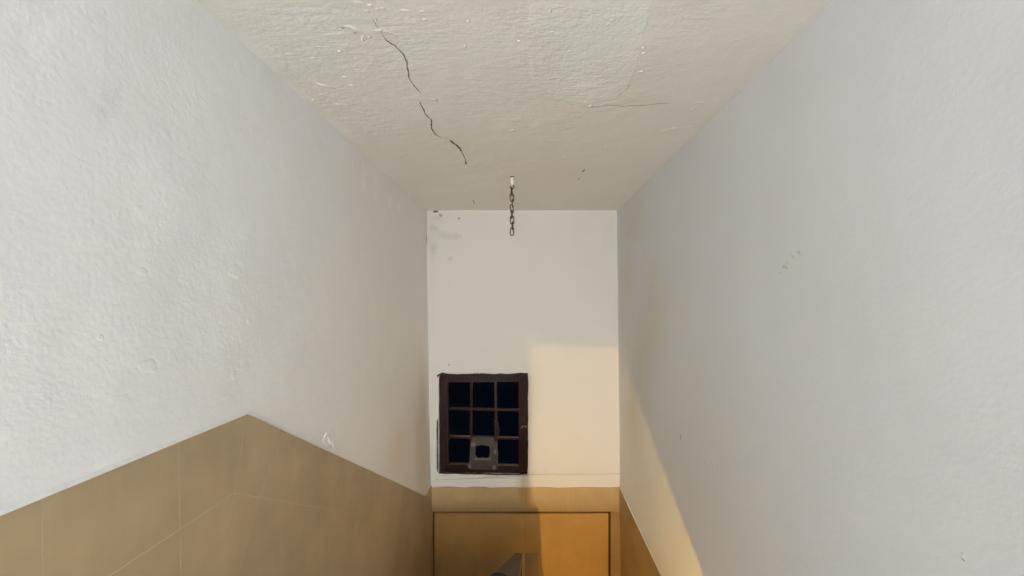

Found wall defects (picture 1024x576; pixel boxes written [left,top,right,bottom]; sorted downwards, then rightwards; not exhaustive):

crack [373,19,472,164]